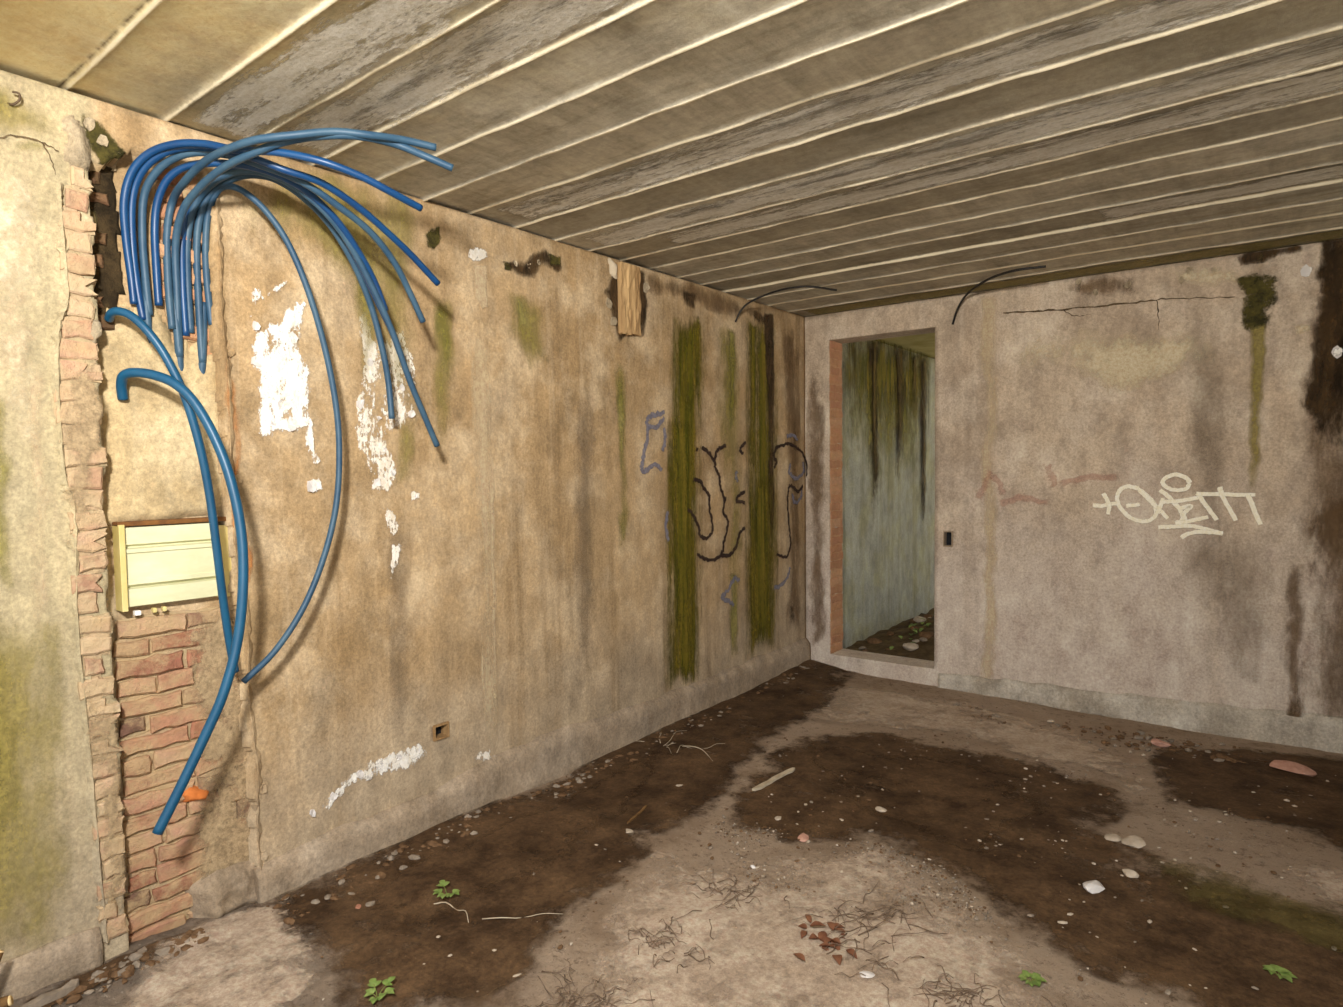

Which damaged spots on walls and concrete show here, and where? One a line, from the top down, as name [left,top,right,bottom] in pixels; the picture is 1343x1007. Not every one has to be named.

crack [0,134,59,175]
peeling [252,282,286,301]
flaking render [50,116,268,943]
peeling [251,302,323,492]
peeling [355,316,416,491]
peeling [385,510,402,573]
damp [649,279,824,678]
damp [894,347,927,516]
damp [1250,327,1265,471]
damp [1304,239,1343,712]
damp [1289,577,1301,717]
peeling [309,744,425,817]